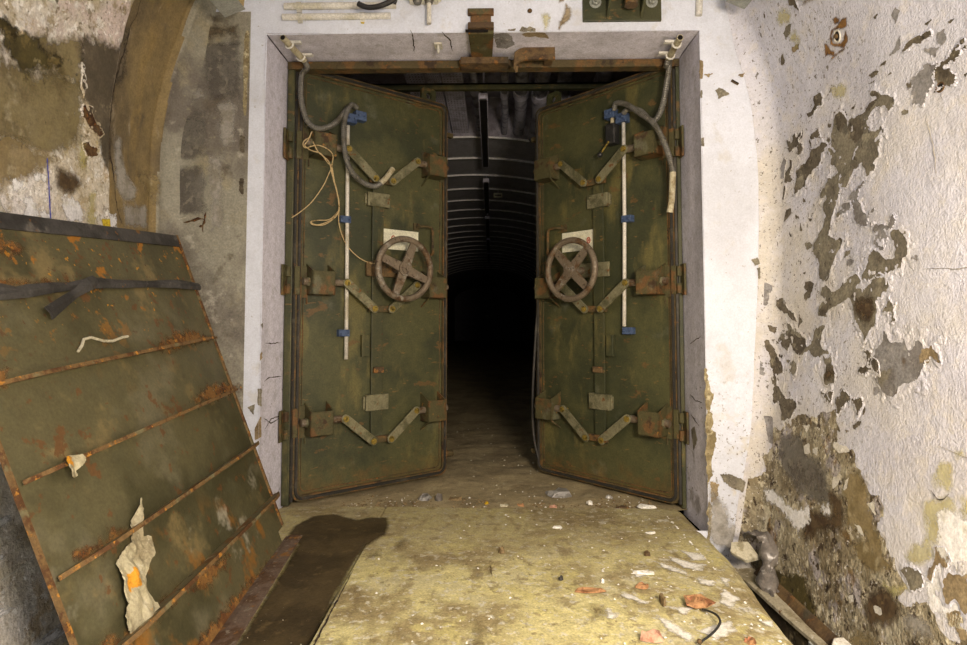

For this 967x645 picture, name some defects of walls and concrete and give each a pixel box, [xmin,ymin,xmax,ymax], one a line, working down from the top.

leakage [0,18,160,227]
flaking render [80,62,105,159]
flaking render [691,19,967,645]
leakage [238,515,387,645]